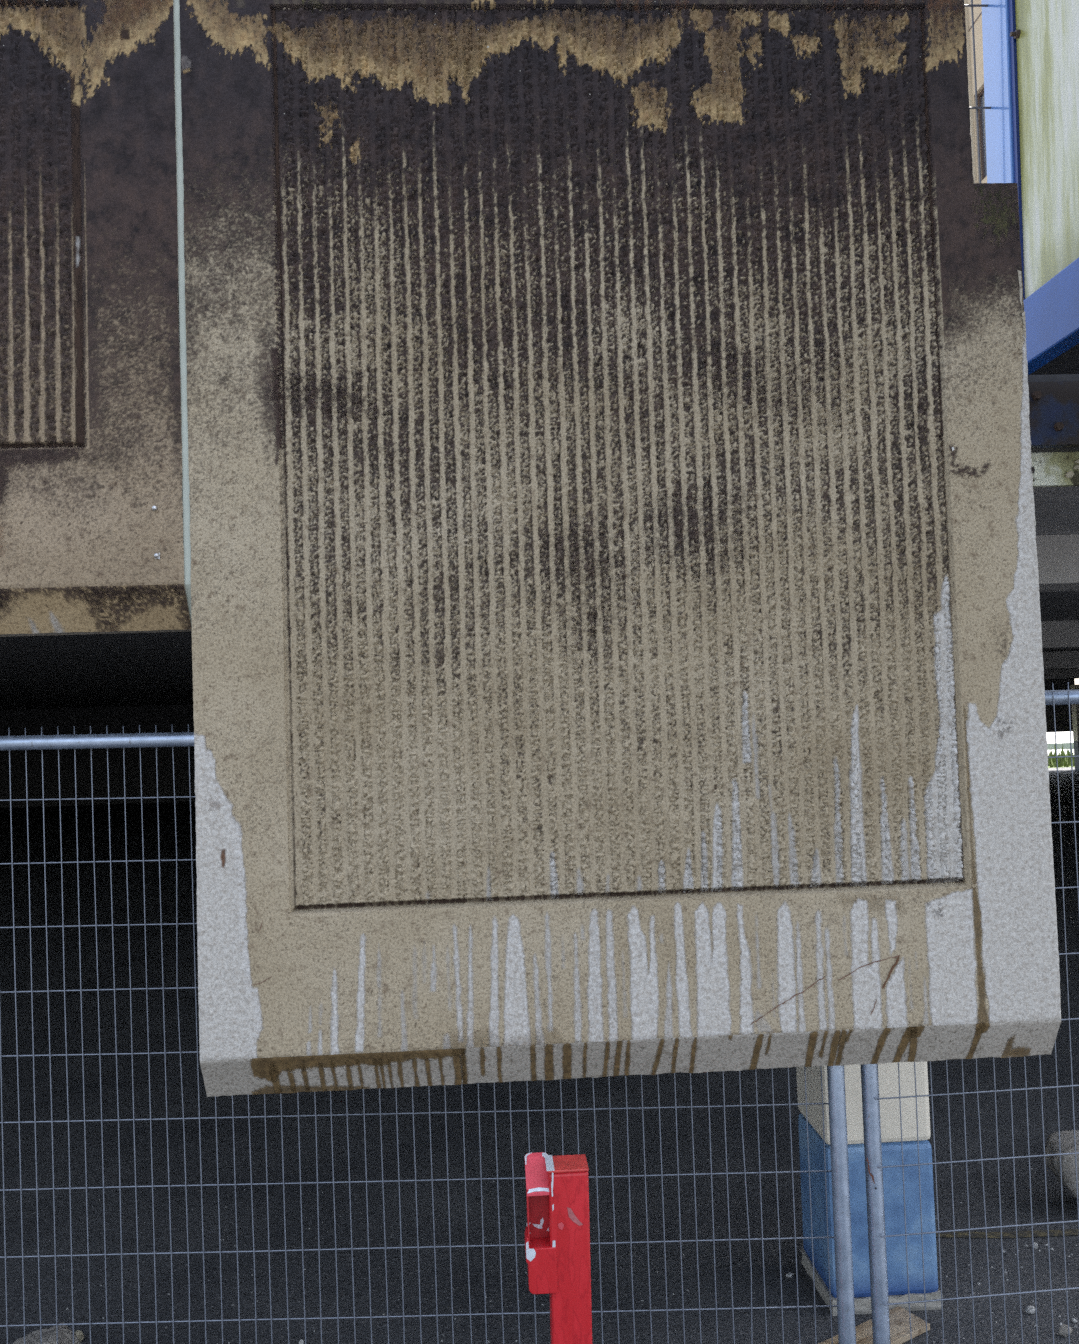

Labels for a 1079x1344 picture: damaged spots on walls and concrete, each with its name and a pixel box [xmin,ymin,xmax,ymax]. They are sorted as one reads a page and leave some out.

damp [0,0,909,133]
damp [924,12,965,72]
damp [316,104,340,149]
damp [349,141,361,164]
damp [0,584,191,632]
damp [194,334,1061,1095]